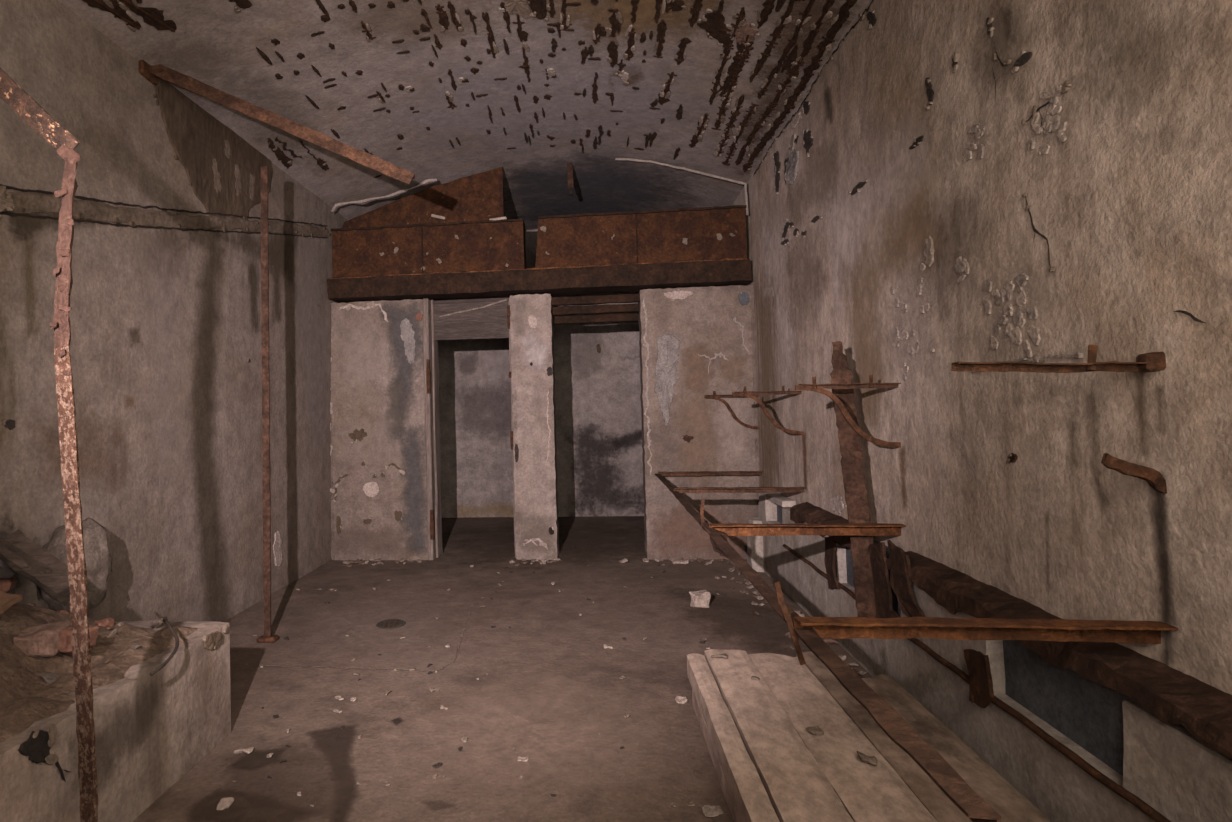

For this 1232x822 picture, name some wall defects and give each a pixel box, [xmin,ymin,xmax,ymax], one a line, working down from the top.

spalling [82,0,177,32]
spalling [229,0,252,13]
flaking render [866,10,877,29]
spalling [256,38,363,89]
spalling [311,0,857,194]
flaking render [925,77,934,110]
flaking render [153,77,292,220]
crack [1022,193,1056,272]
leakage [348,306,425,552]
flaking render [361,460,406,497]